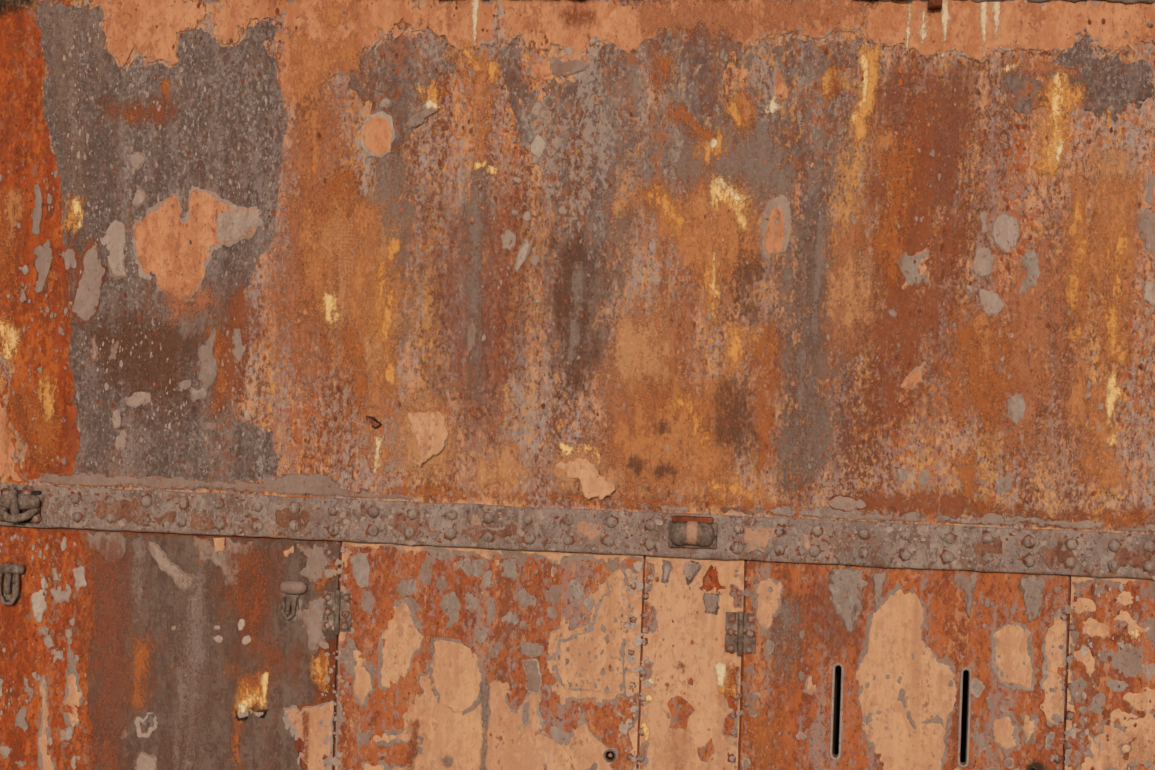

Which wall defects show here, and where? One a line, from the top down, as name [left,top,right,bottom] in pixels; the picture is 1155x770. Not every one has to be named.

rust [418,14,525,211]
rust [0,318,19,361]
rust [0,190,25,282]
rust [14,376,59,472]
rust [62,75,800,553]
peeling [0,0,1155,491]
rust [806,38,1155,496]
rust [225,548,332,770]
peeling [0,458,784,770]
peeling [721,494,1155,770]
rust [1083,564,1140,662]
rust [1101,685,1155,764]